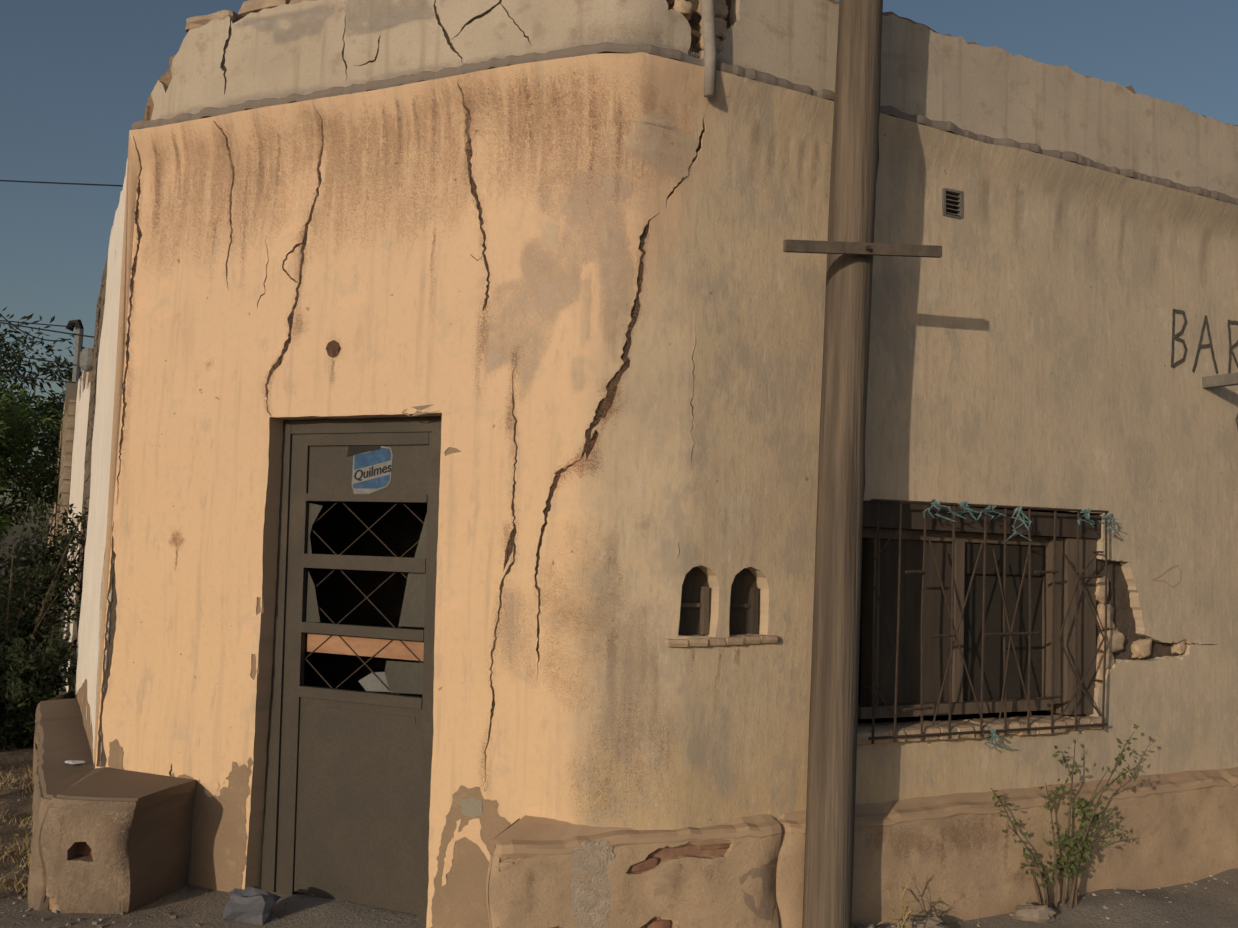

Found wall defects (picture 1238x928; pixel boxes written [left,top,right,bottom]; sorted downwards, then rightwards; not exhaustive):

crack [222,18,234,83]
crack [342,20,380,74]
spalling [666,0,731,58]
damp [125,0,703,324]
crack [116,158,143,503]
crack [257,115,327,416]
crack [435,0,705,795]
spalling [68,255,124,770]
spalling [1095,560,1187,686]
peeling [171,757,254,892]
peeling [430,785,511,928]
spalling [627,843,731,873]